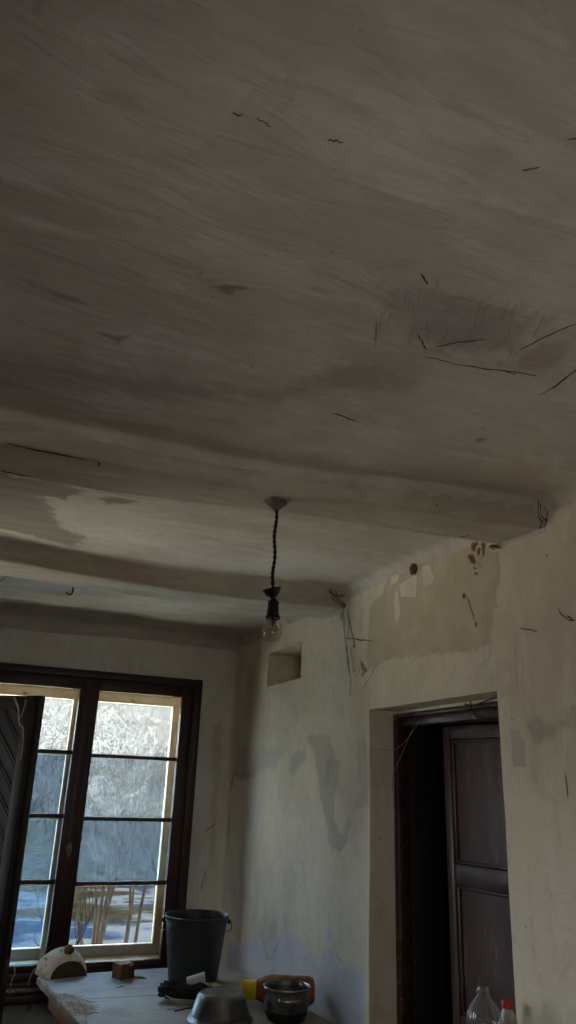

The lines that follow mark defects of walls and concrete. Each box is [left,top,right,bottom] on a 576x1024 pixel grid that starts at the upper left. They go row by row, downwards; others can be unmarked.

crack [427,324,576,395]
peeling [340,543,505,678]
crack [461,591,478,628]